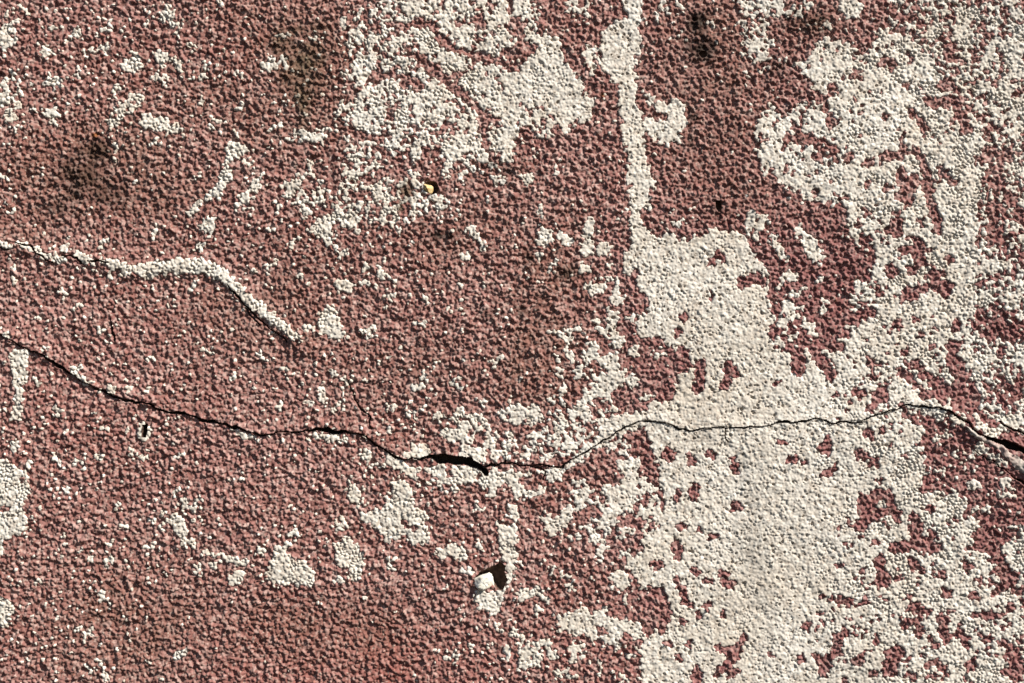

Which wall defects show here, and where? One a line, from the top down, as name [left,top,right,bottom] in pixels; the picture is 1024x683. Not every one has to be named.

peeling [259,56,282,73]
crack [109,318,117,345]
crack [0,334,1024,485]
peeling [271,0,1024,683]